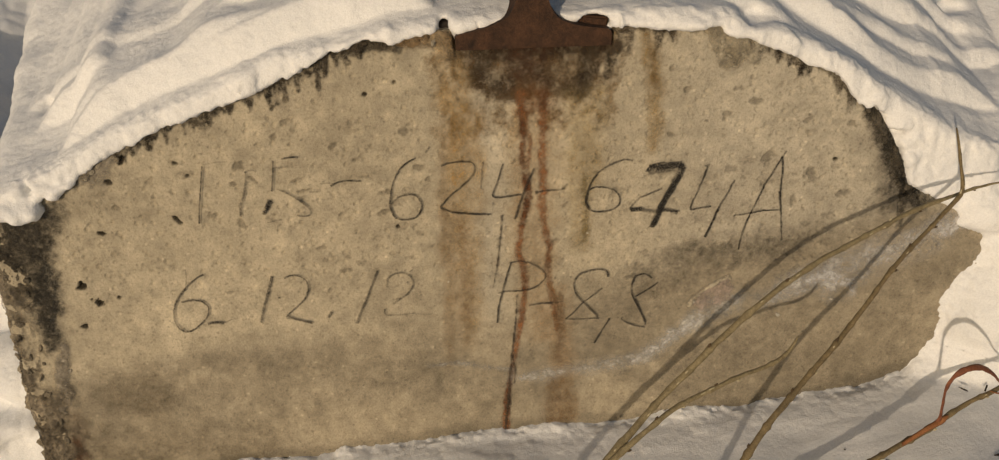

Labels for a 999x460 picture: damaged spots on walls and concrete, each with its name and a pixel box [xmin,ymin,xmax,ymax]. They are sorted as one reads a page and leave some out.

water stain [449,33,622,100]
rust [503,57,581,429]